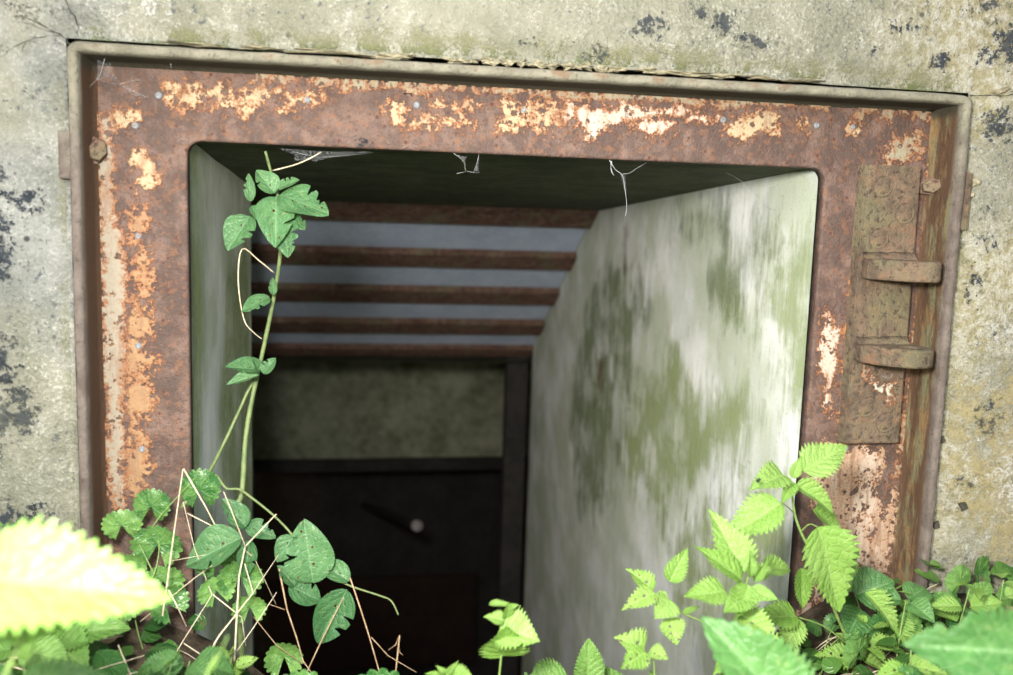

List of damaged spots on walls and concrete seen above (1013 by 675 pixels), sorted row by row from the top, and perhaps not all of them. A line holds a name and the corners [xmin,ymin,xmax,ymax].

crack [4,0,79,56]
water stain [573,269,744,506]
water stain [709,213,739,314]
water stain [772,247,807,403]
corrosion [833,280,850,445]
water stain [939,315,1013,571]
water stain [677,512,718,606]
water stain [748,525,783,563]